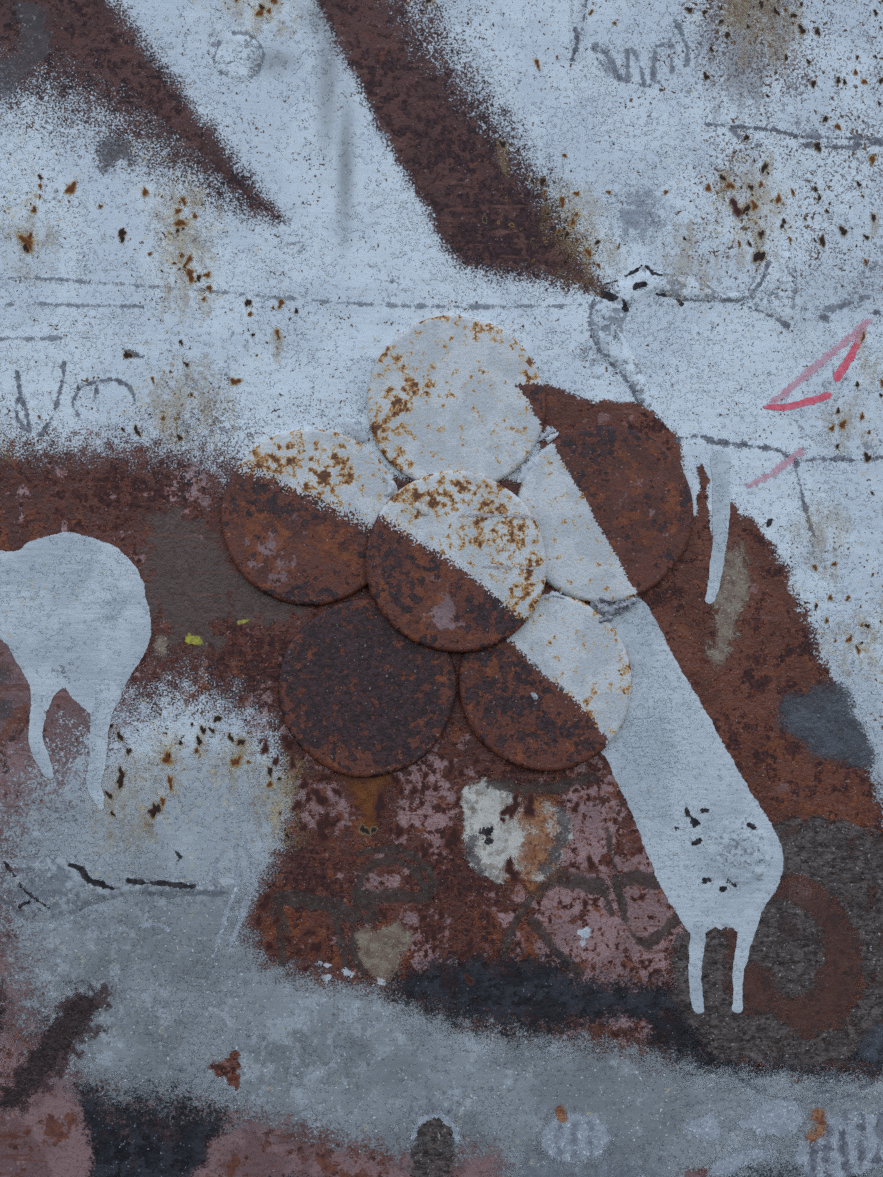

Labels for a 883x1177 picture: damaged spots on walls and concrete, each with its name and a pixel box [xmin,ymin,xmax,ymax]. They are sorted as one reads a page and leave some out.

crack [570,0,588,62]
rust [685,0,736,52]
rust [747,0,820,44]
rust [836,41,883,87]
rust [0,0,289,233]
rust [314,0,615,300]
rust [705,159,769,262]
rust [18,232,33,253]
rust [161,253,212,301]
rust [245,299,298,344]
rust [0,381,883,1091]
peeling [460,777,574,899]